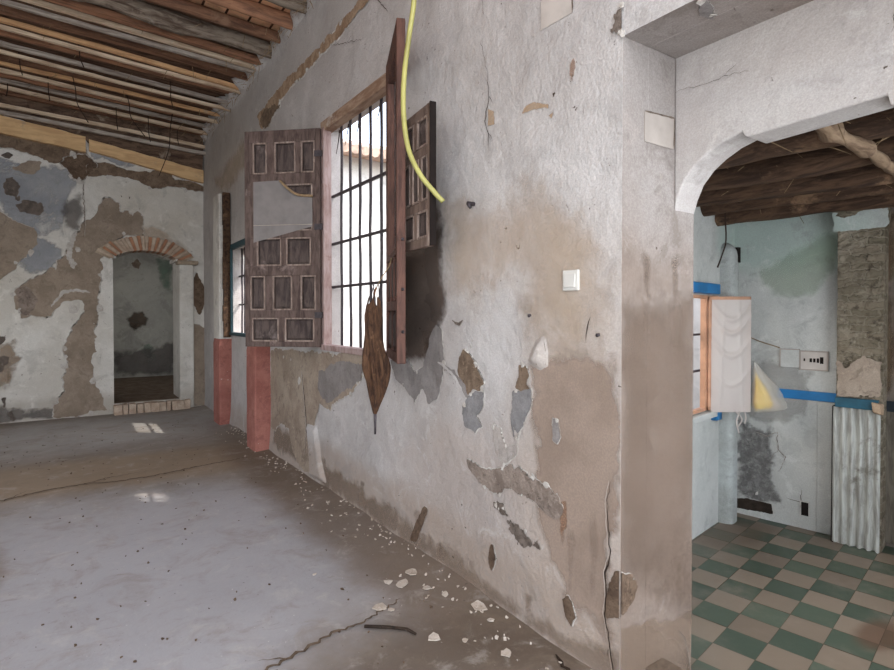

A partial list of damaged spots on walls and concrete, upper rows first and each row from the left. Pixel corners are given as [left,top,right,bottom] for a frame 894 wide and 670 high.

spalling [257,0,370,131]
crack [479,40,492,147]
spalling [610,1,625,38]
peeling [0,134,204,280]
peeling [10,197,145,419]
peeling [194,272,205,406]
peeling [438,339,564,550]
leakage [737,421,780,502]
crack [258,598,400,670]
crack [555,654,570,670]
crack [602,482,613,670]
spalling [605,570,638,619]